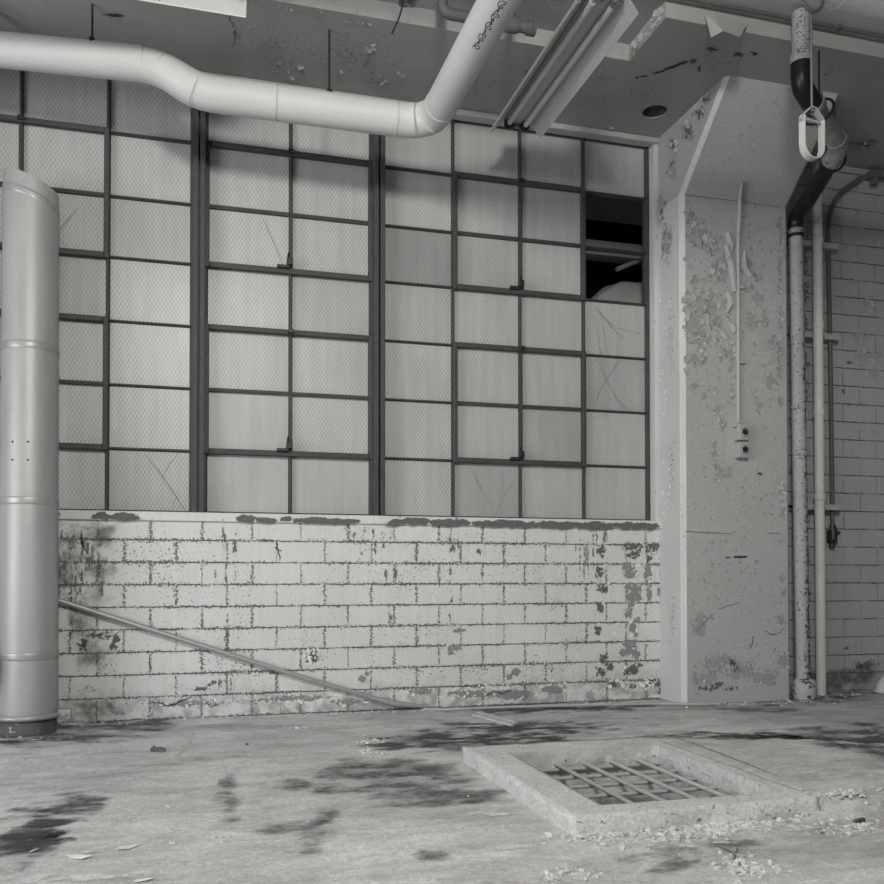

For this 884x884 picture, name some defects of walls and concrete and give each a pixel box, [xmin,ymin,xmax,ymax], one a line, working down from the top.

peeling [657,94,711,265]
peeling [659,206,786,483]
peeling [58,511,141,611]
peeling [236,514,679,701]
peeling [692,649,791,691]
damp [342,704,654,816]
damp [0,794,106,856]